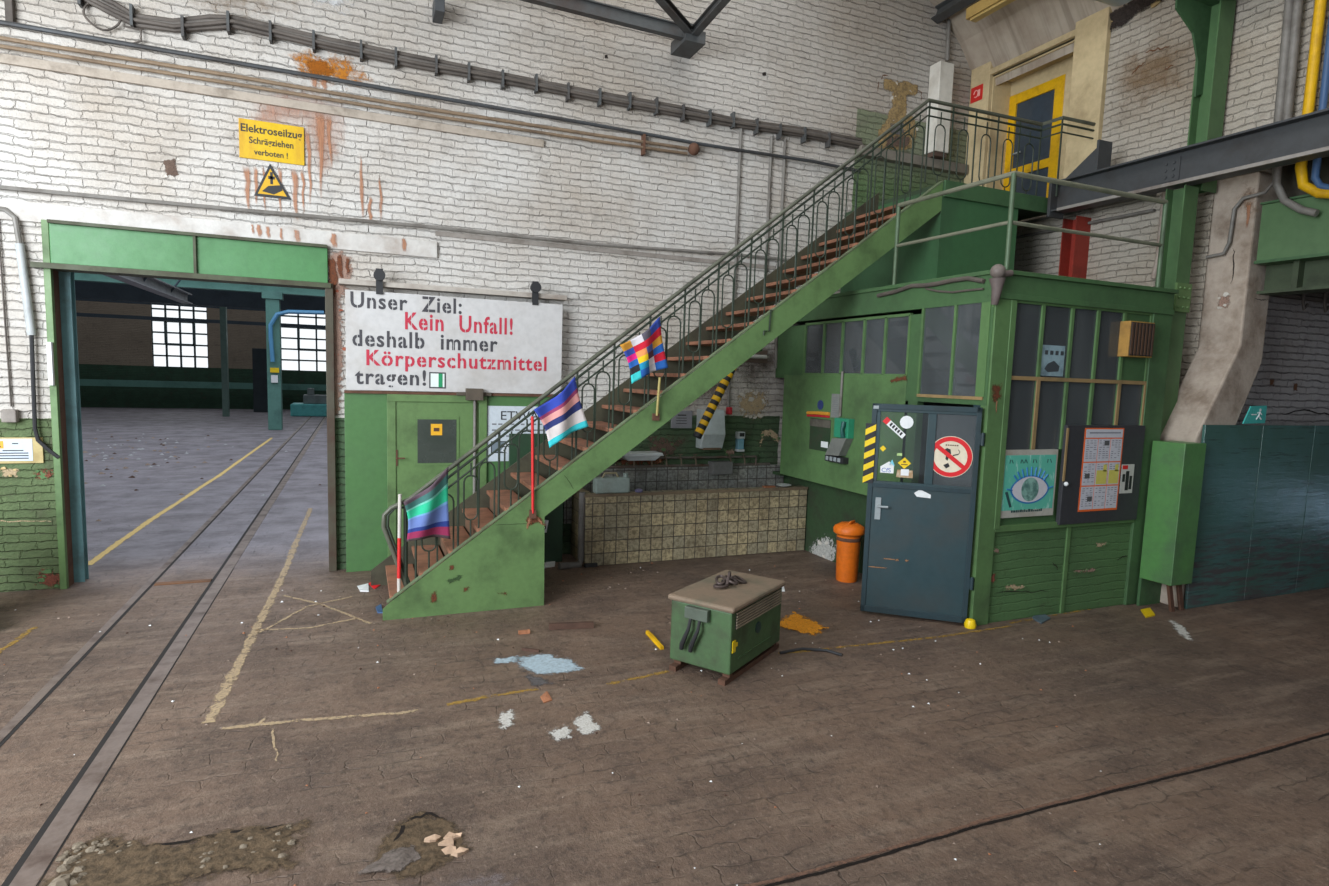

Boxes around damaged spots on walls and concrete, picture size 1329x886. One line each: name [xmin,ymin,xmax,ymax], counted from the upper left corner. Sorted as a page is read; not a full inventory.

rust [293,53,366,89]
rust [244,105,332,213]
rust [360,161,383,220]
rust [251,225,300,240]
spalling [144,829,244,846]
spalling [393,812,469,858]